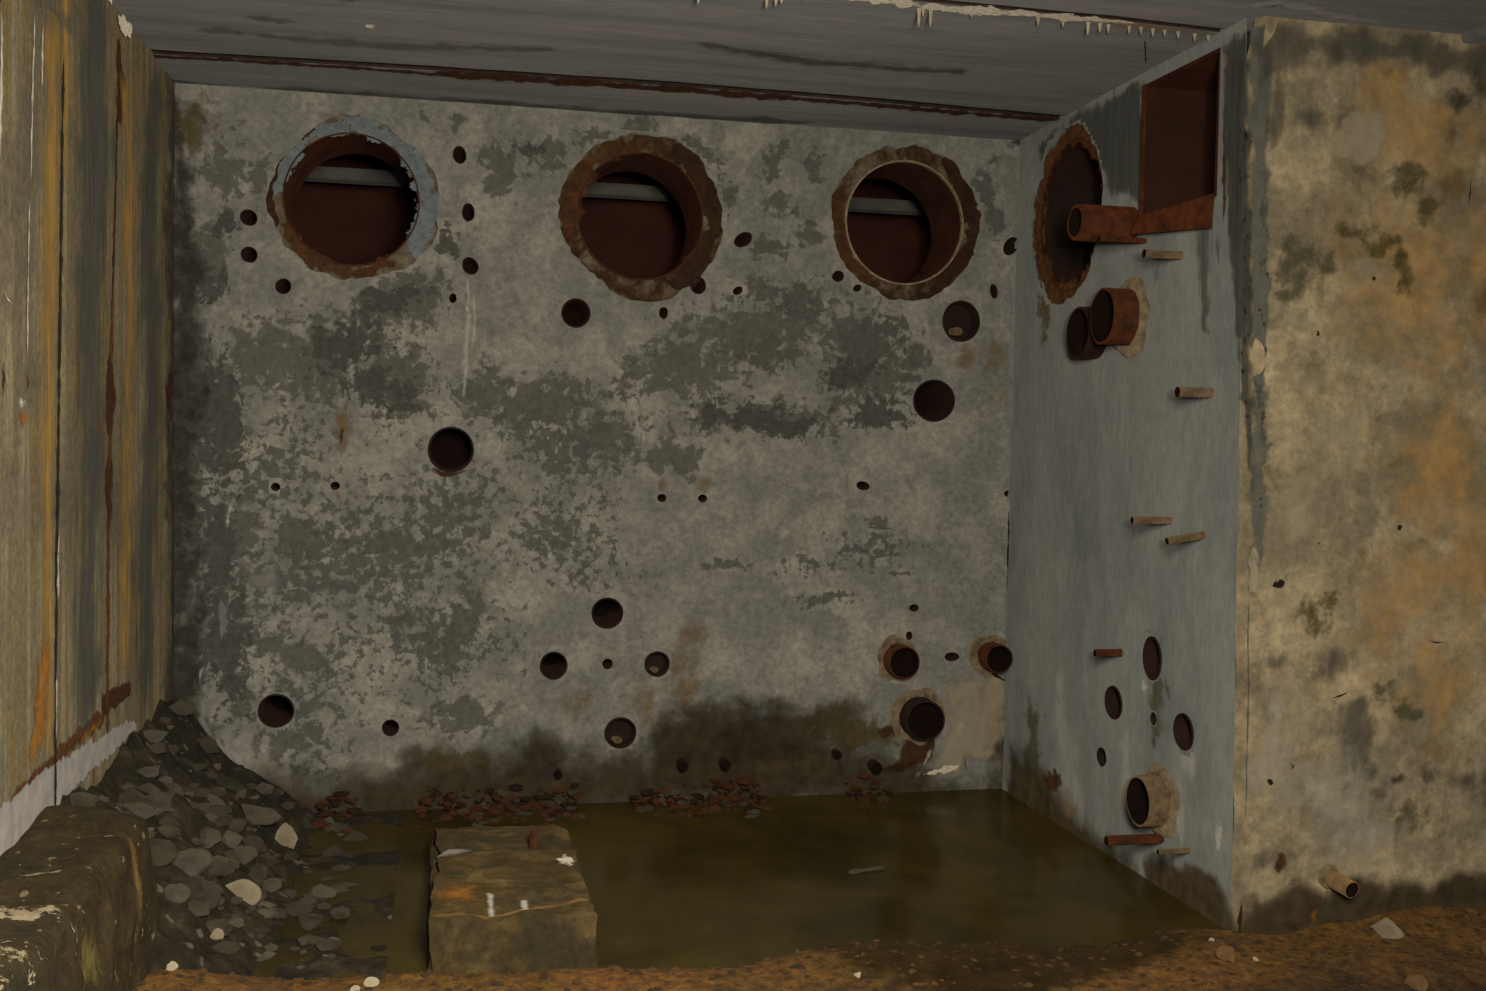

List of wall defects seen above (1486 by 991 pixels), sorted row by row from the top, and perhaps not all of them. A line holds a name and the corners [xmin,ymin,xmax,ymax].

water stain [703,43,964,73]
water stain [850,0,1210,42]
water stain [971,156,1006,241]
water stain [1040,83,1141,200]
rust [12,0,135,800]
water stain [76,0,115,724]
water stain [134,79,966,818]
rust [1037,296,1050,344]
water stain [1198,25,1486,565]
water stain [1298,592,1337,634]
water stain [987,667,1486,935]
water stain [819,933,1182,991]